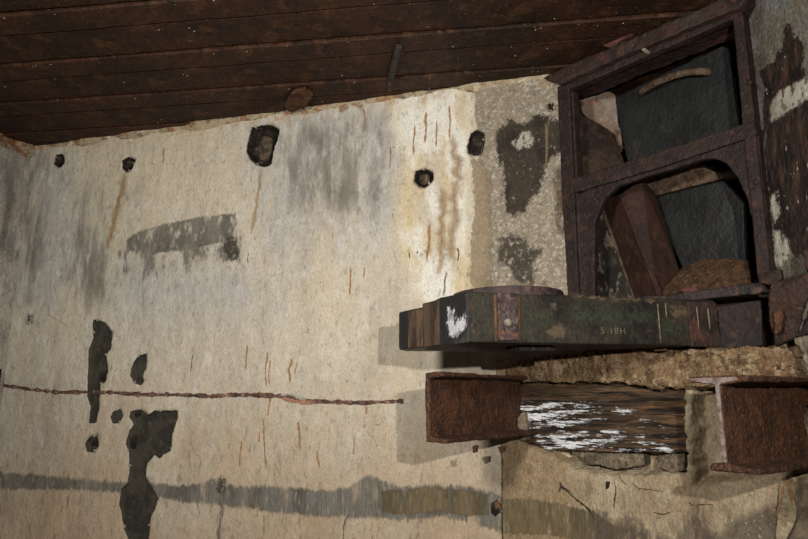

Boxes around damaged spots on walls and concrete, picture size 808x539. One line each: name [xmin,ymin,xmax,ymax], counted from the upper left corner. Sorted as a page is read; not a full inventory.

leakage [770,78,808,122]
rust [108,179,124,242]
hole [246,125,279,166]
rust [413,113,437,152]
rust [426,145,459,262]
leakage [494,113,564,237]
efflorescence [772,231,790,267]
spalling [87,319,112,423]
crack [3,384,403,405]
spalling [85,434,98,452]
spalling [111,409,177,539]
leakage [150,477,668,539]